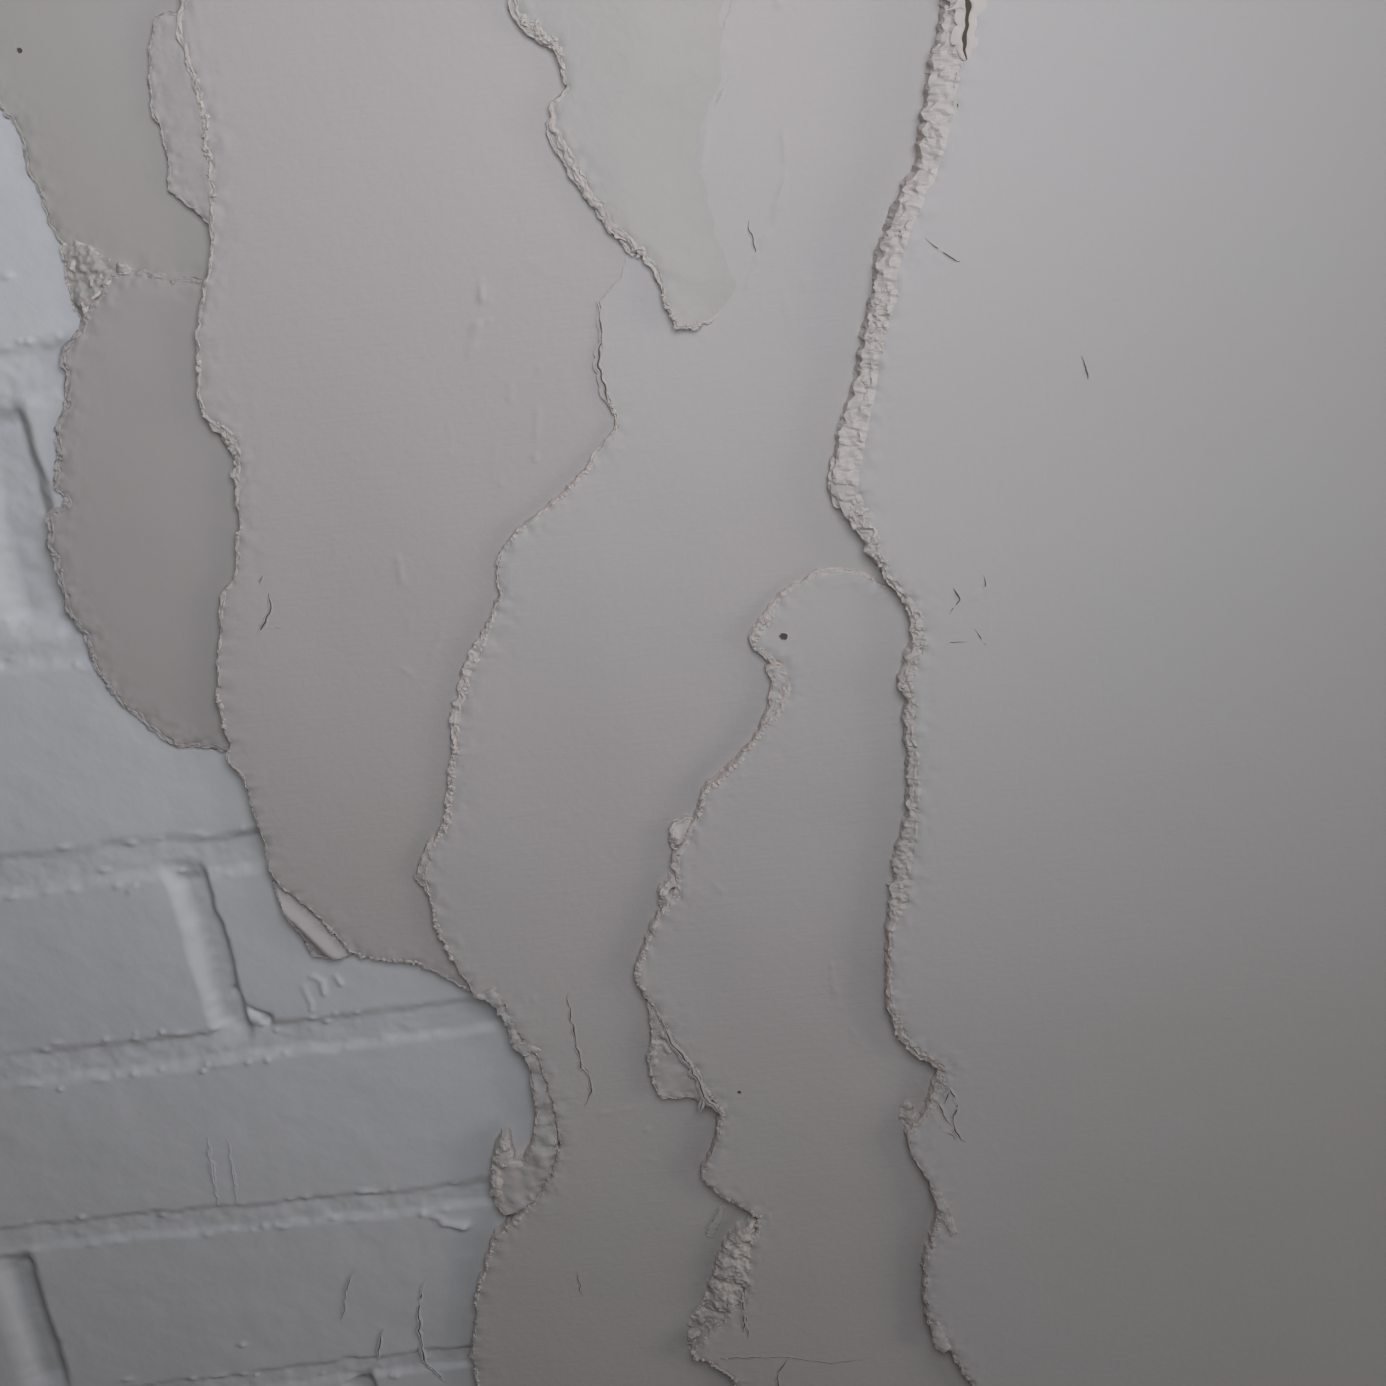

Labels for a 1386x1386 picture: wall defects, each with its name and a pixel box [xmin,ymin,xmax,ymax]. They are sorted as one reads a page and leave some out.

peeling [0,0,736,992]
peeling [414,0,1386,1386]